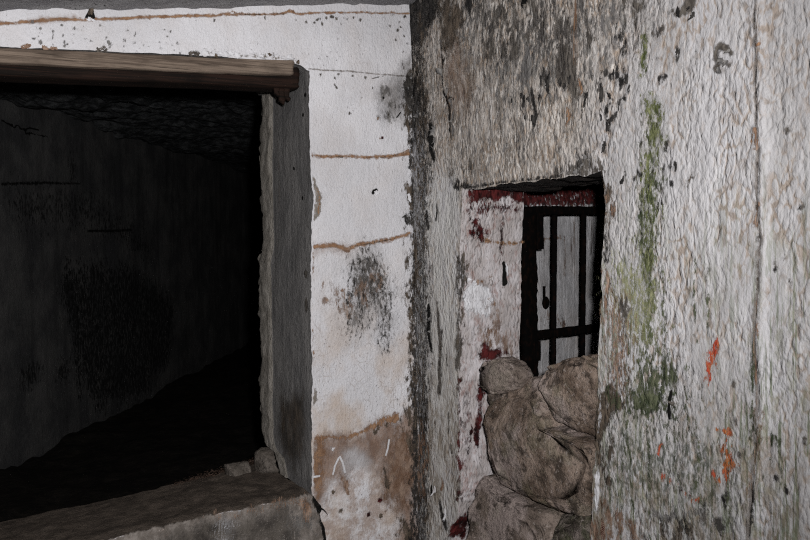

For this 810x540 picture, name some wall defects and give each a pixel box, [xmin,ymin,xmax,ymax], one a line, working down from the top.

leakage [620,91,677,381]
leakage [110,0,665,540]
rust [704,339,720,385]
peeling [332,448,364,475]
rust [711,427,740,483]